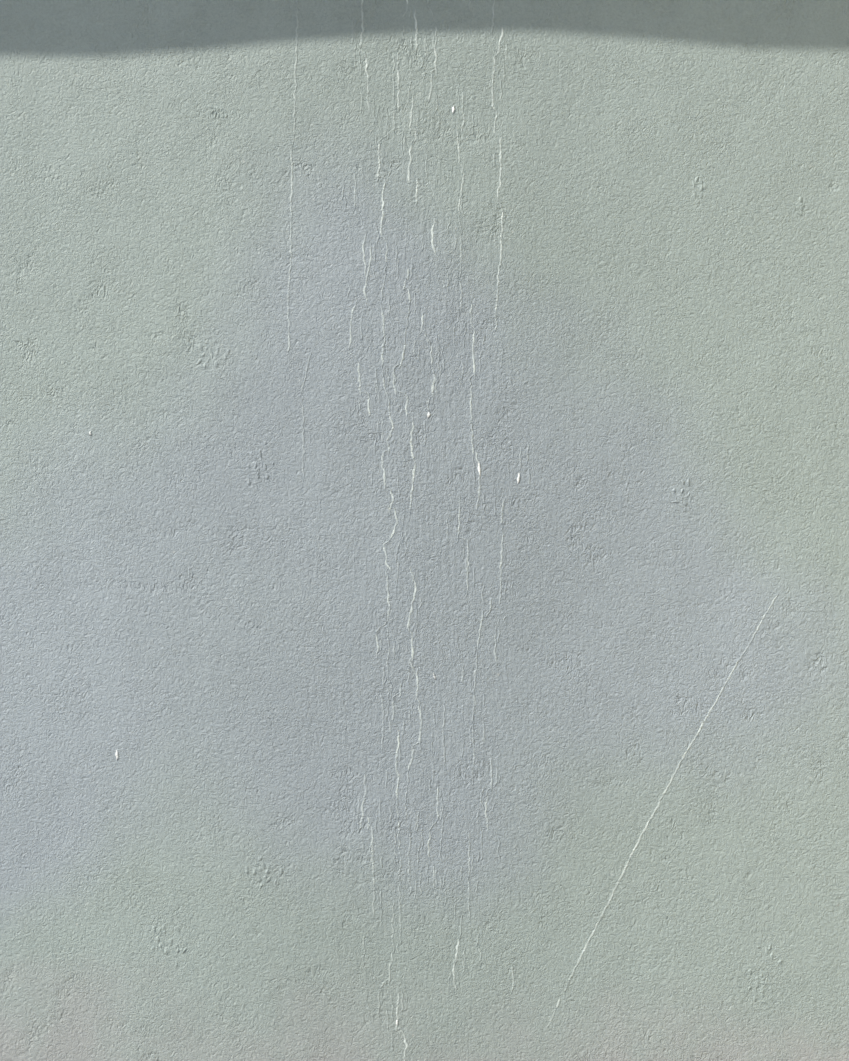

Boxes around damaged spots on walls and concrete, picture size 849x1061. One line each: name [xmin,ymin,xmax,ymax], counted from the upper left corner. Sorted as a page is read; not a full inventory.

crack [287,0,312,481]
crack [342,0,531,1061]